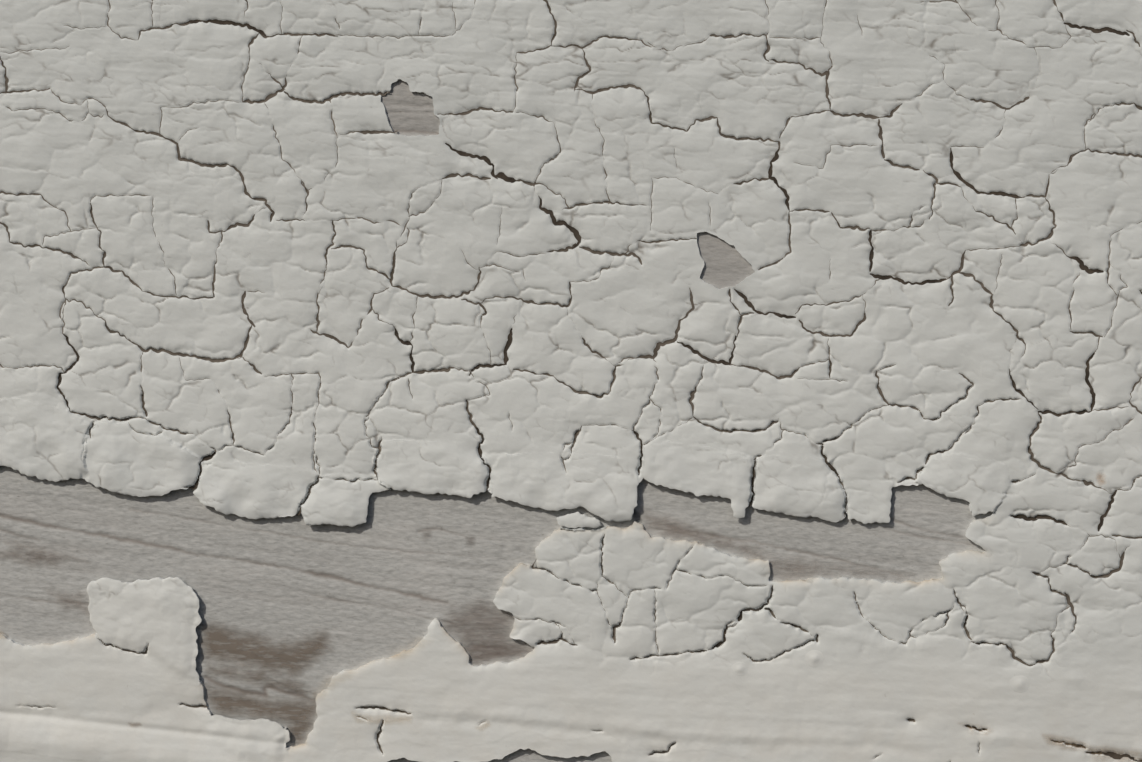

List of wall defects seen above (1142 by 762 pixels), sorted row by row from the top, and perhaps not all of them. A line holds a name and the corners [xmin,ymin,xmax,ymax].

crack [0,0,463,490]
peeling [381,79,440,136]
crack [297,0,1142,666]
peeling [697,232,755,289]
crack [97,638,149,654]
peeling [0,398,1007,762]